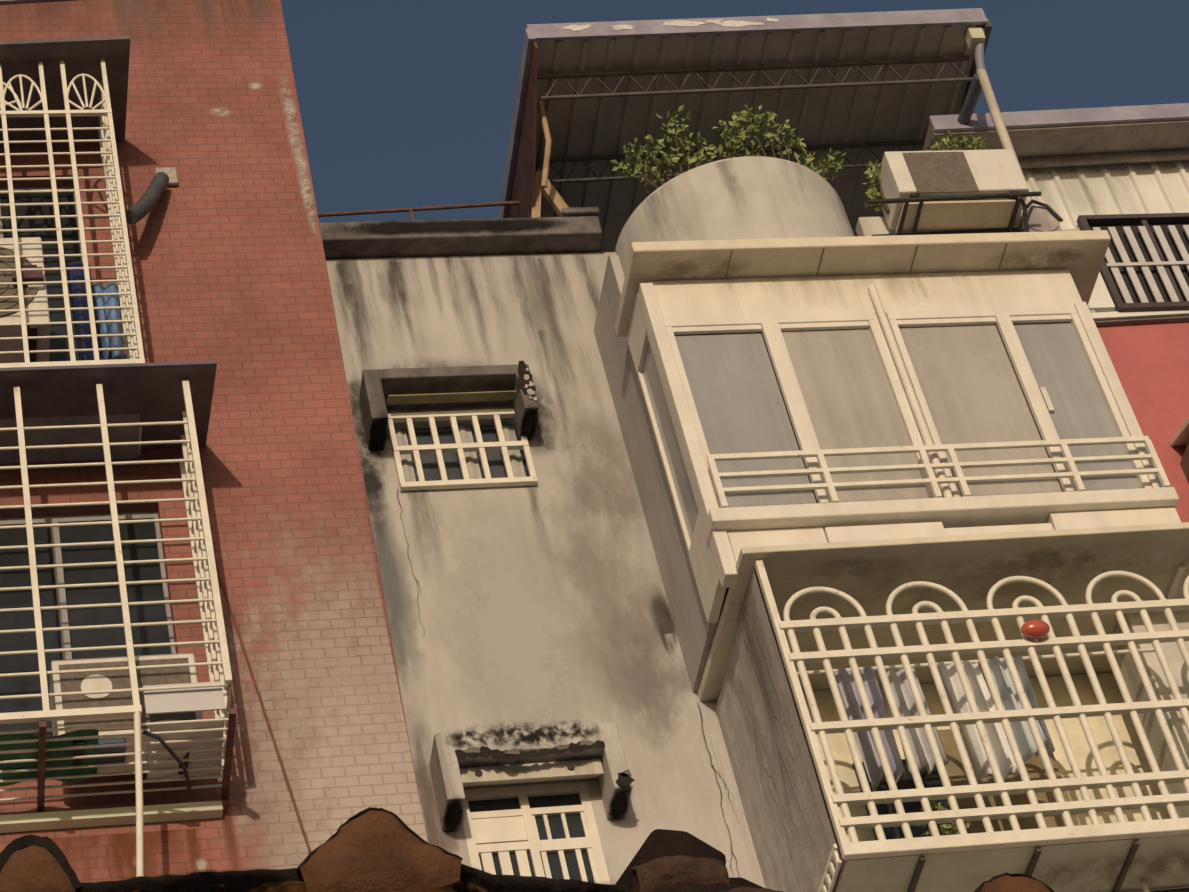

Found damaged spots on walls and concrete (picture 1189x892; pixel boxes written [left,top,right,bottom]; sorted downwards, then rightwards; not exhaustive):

peeling [562,24,591,32]
peeling [663,18,780,27]
leakage [284,89,313,215]
leakage [520,398,548,445]
leakage [350,390,388,510]
leakage [652,597,675,651]
leakage [451,723,588,746]
crack [738,606,815,881]
leakage [609,789,630,819]
crack [697,702,740,877]
leakage [446,870,619,892]